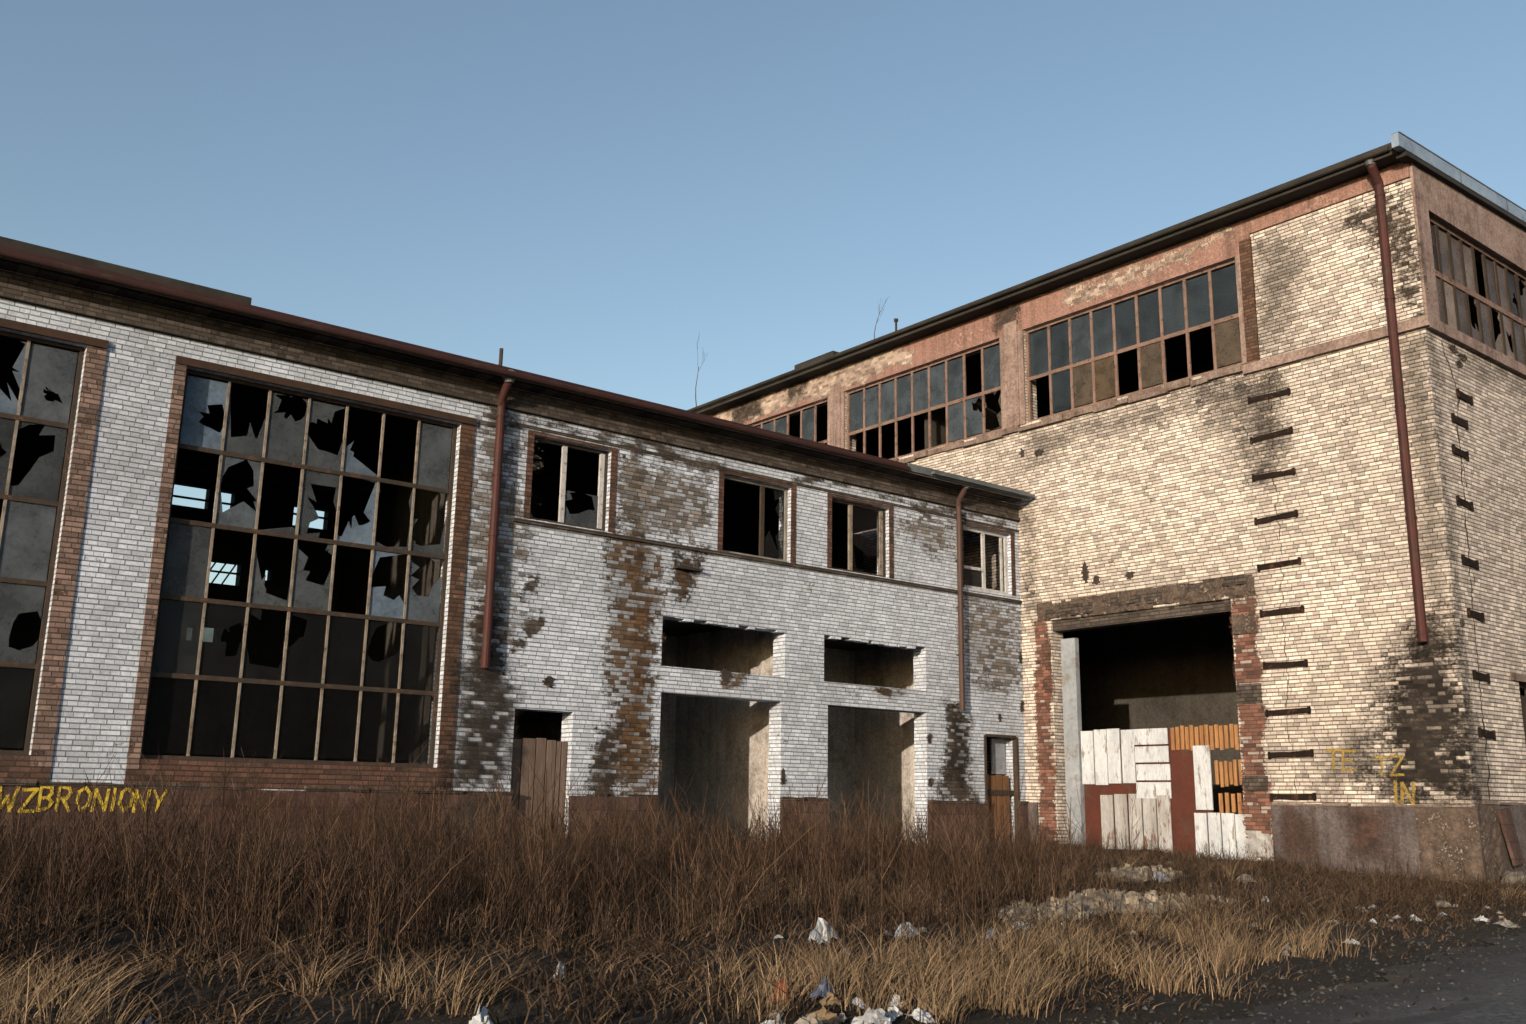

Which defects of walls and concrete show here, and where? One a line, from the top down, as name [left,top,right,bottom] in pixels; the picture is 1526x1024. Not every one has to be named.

peeling [465,403,726,673]
water stain [1350,602,1482,808]